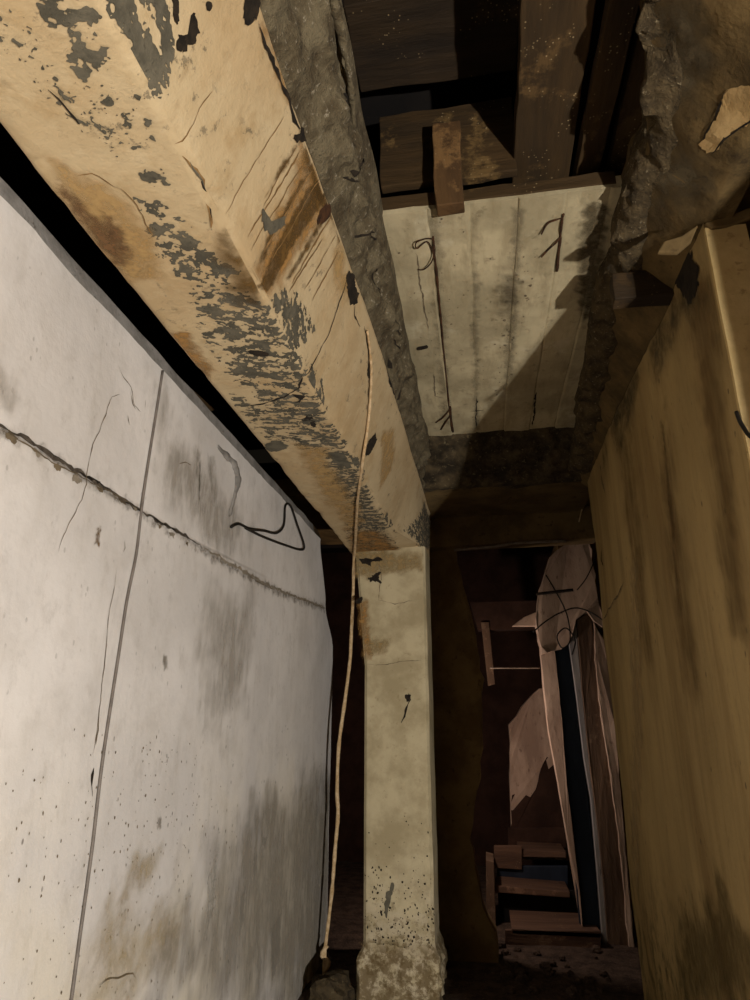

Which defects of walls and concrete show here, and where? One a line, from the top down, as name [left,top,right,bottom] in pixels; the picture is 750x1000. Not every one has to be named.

peeling [0,0,200,157]
crack [175,24,300,228]
spalling [243,0,261,26]
peeling [698,85,750,153]
crack [0,370,326,609]
peeling [133,197,431,584]
crack [240,269,382,427]
water stain [188,782,330,999]